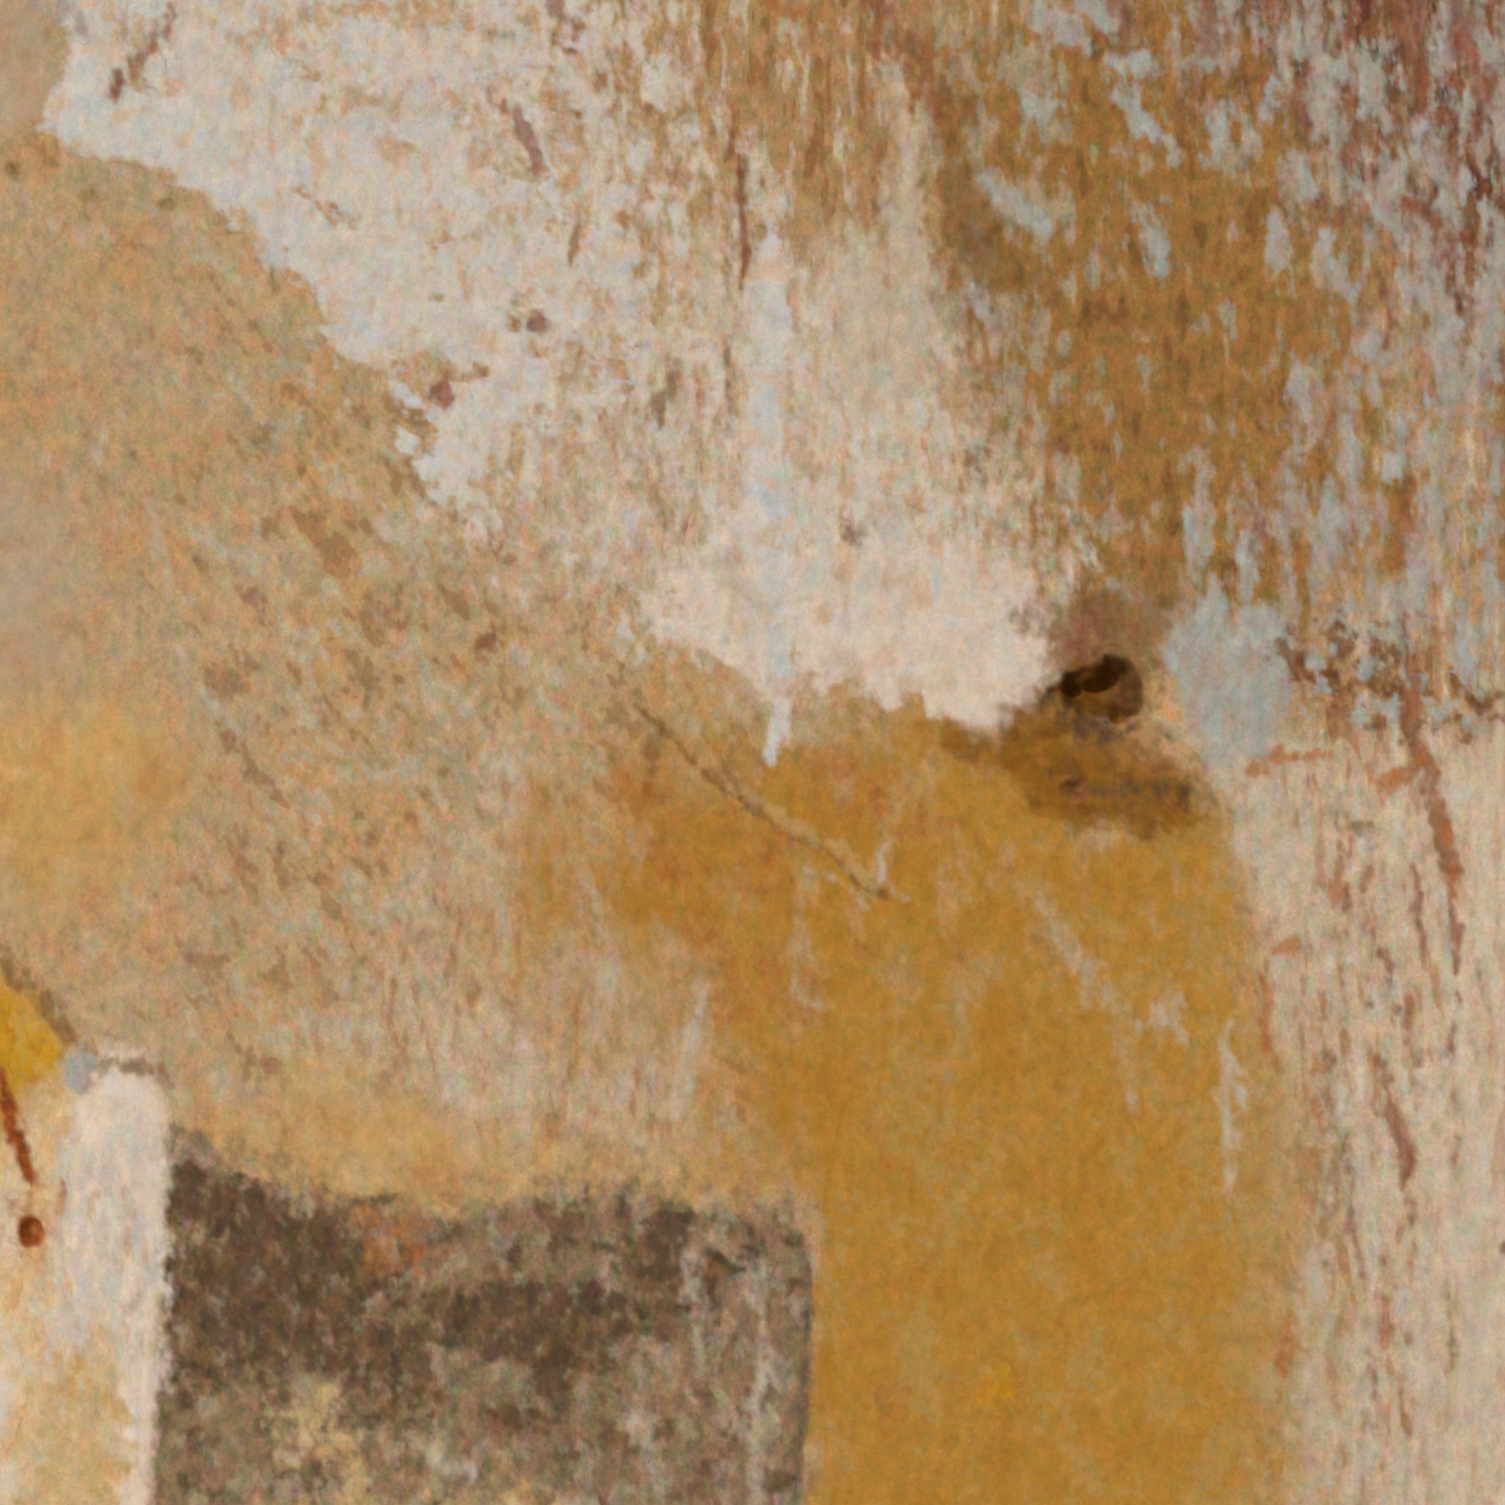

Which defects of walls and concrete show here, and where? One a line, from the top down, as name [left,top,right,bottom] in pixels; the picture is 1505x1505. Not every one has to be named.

peeling [27,0,1110,722]
peeling [983,0,1505,1017]
crack [613,688,904,926]
corrosion [0,1049,72,1272]
damp [166,1157,809,1505]